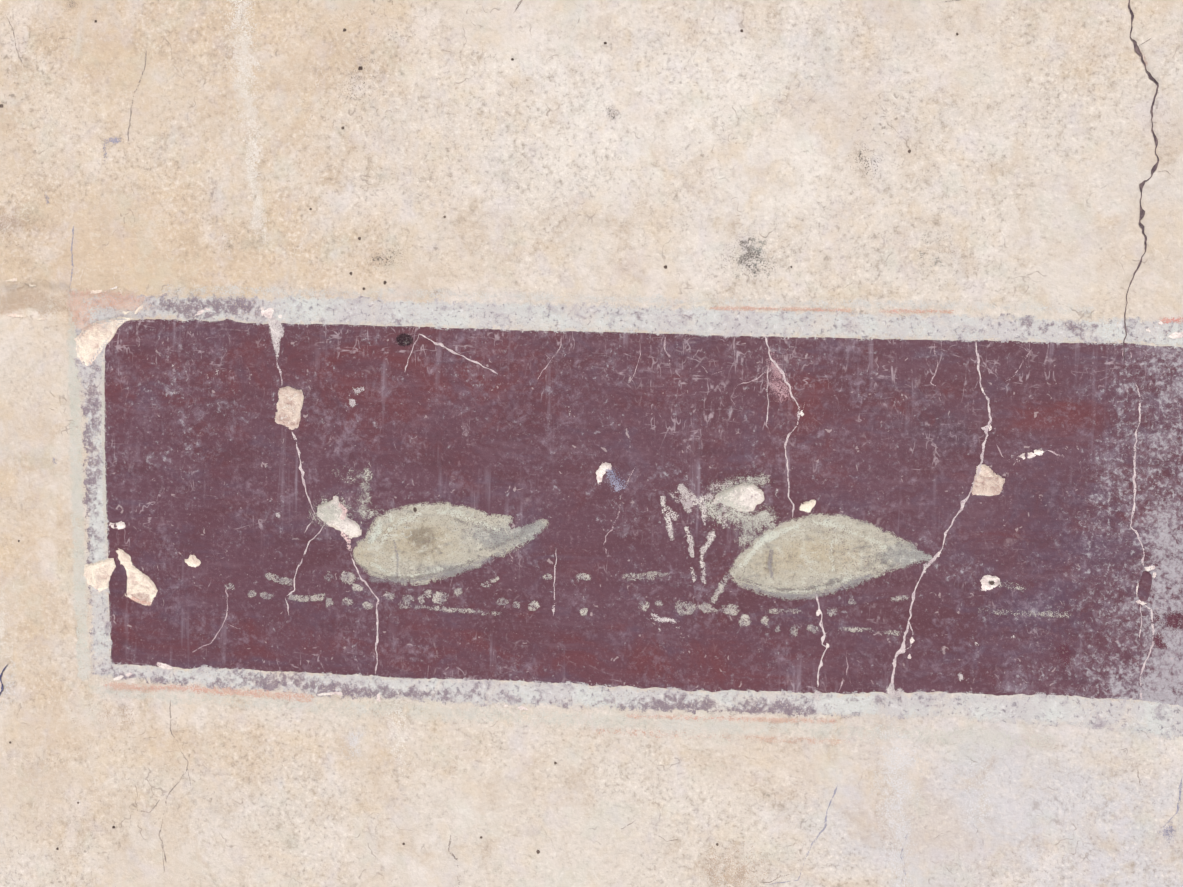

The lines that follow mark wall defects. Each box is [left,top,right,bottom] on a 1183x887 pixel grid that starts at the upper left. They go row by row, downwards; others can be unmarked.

spalling [65,286,151,366]
crack [1122,0,1172,566]
spalling [275,387,304,430]
crack [285,432,324,614]
spalling [309,462,384,551]
crack [702,337,804,518]
crack [886,345,1032,700]
spalling [969,464,1005,496]
peeling [997,446,1064,460]
spalling [83,548,157,606]
crack [351,555,390,673]
crack [1139,604,1155,699]